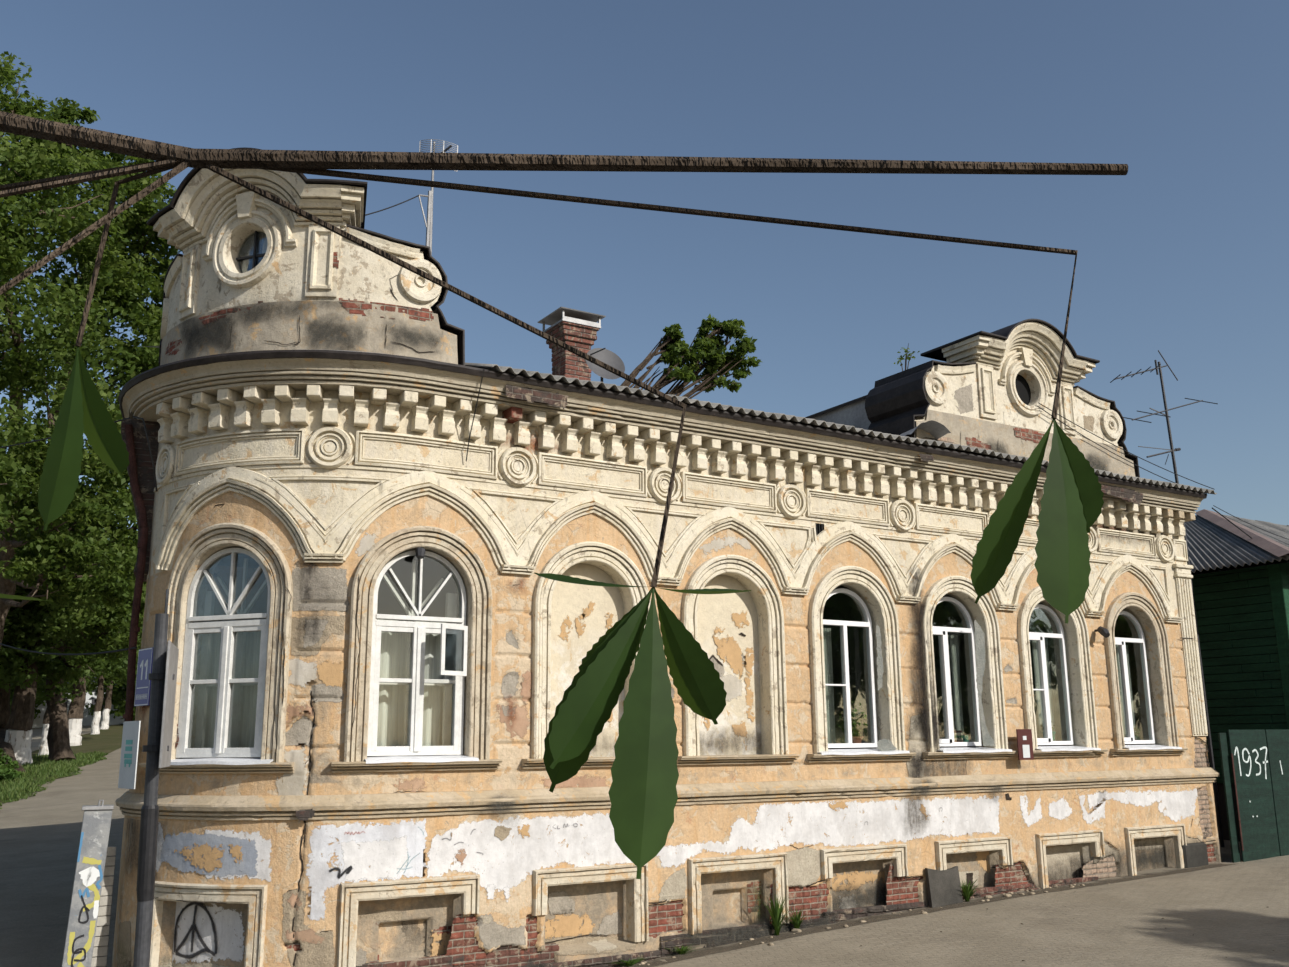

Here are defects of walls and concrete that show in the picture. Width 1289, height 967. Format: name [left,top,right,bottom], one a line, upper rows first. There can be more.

flaking render [199,301,263,326]
flaking render [339,298,434,321]
peeling [558,601,617,641]
crack [352,577,360,726]
peeling [709,610,755,738]
crack [282,567,332,966]
flaking render [542,775,608,788]
flaking render [494,824,530,841]
flaking render [886,864,923,905]
flaking render [959,850,1030,887]
flaking render [282,888,335,967]
flaking render [356,868,687,967]